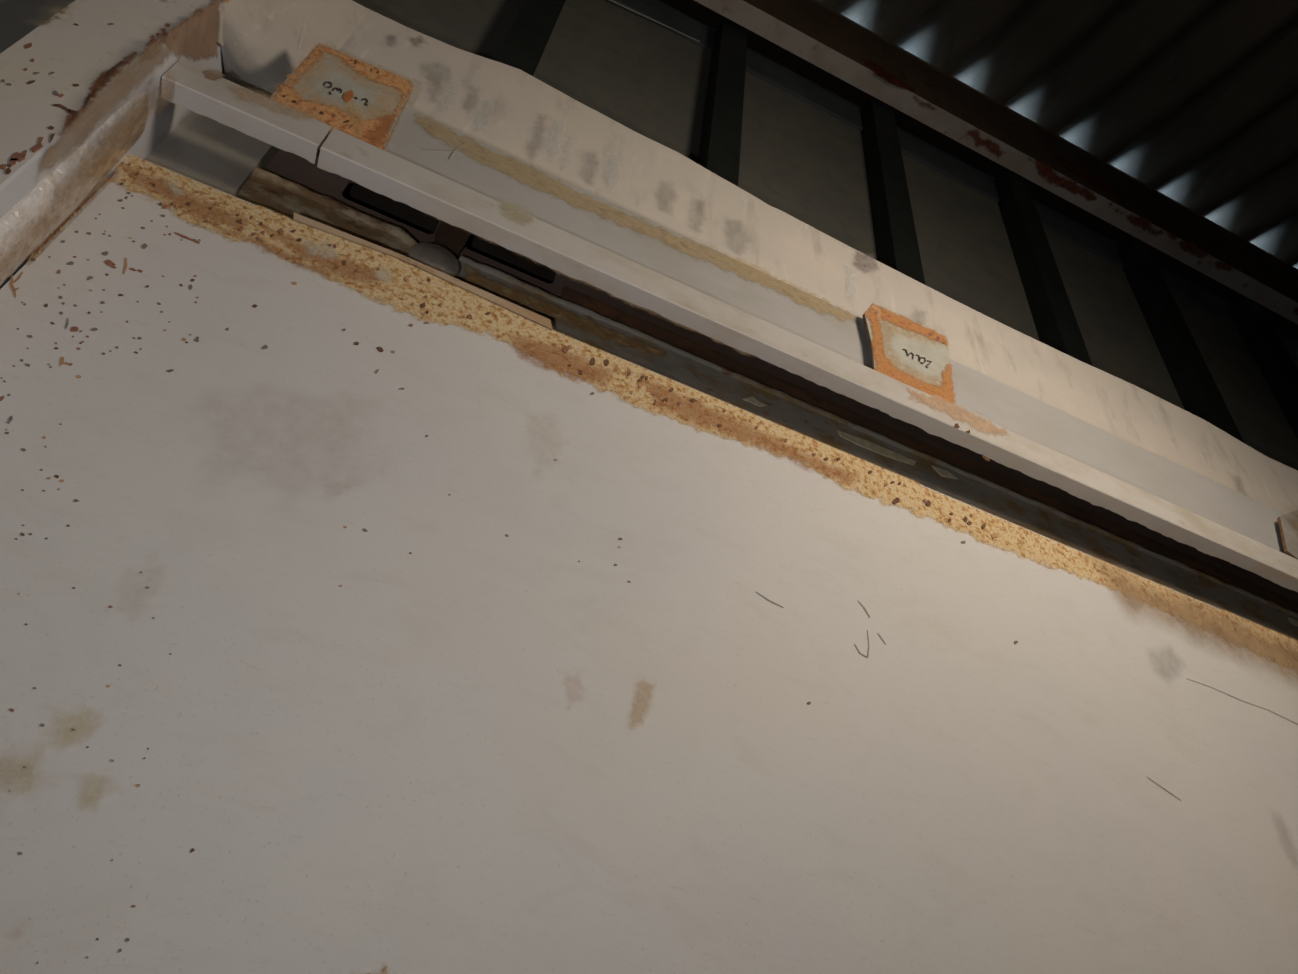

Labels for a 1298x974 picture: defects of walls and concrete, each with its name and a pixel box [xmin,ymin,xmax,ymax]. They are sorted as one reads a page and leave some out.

rust [53,0,229,134]
rust [271,43,412,149]
rust [861,58,935,110]
peeling [102,251,143,273]
rust [10,117,1298,675]
peeling [837,430,916,465]